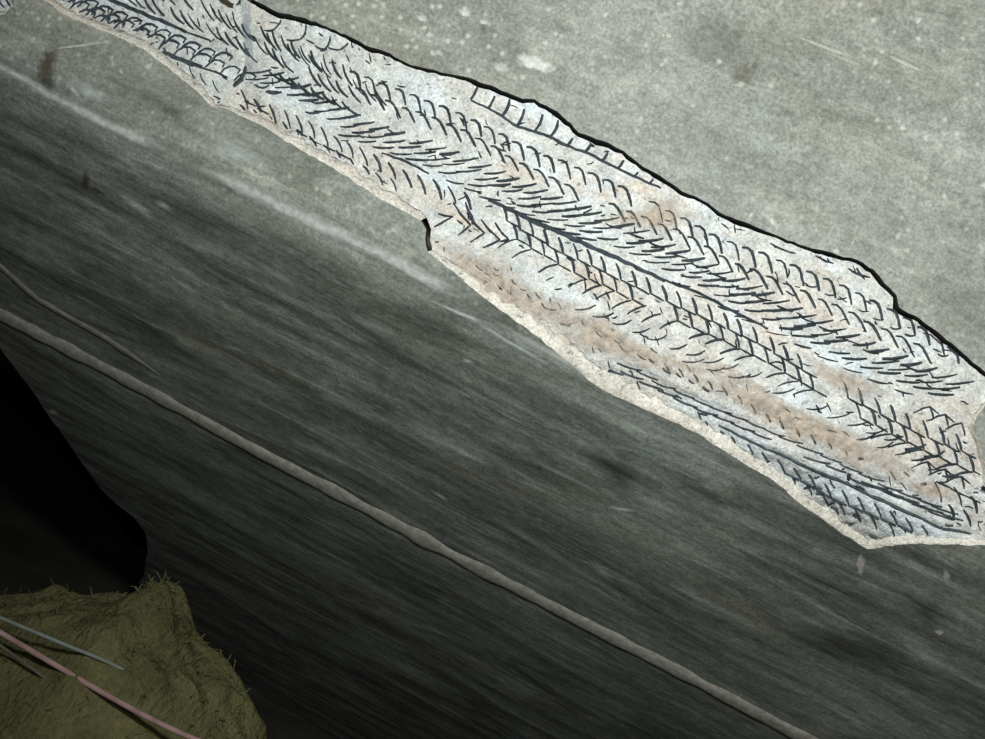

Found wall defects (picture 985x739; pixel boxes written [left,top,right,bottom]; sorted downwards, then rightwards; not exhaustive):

flaking render [0,0,13,15]
flaking render [44,0,985,549]